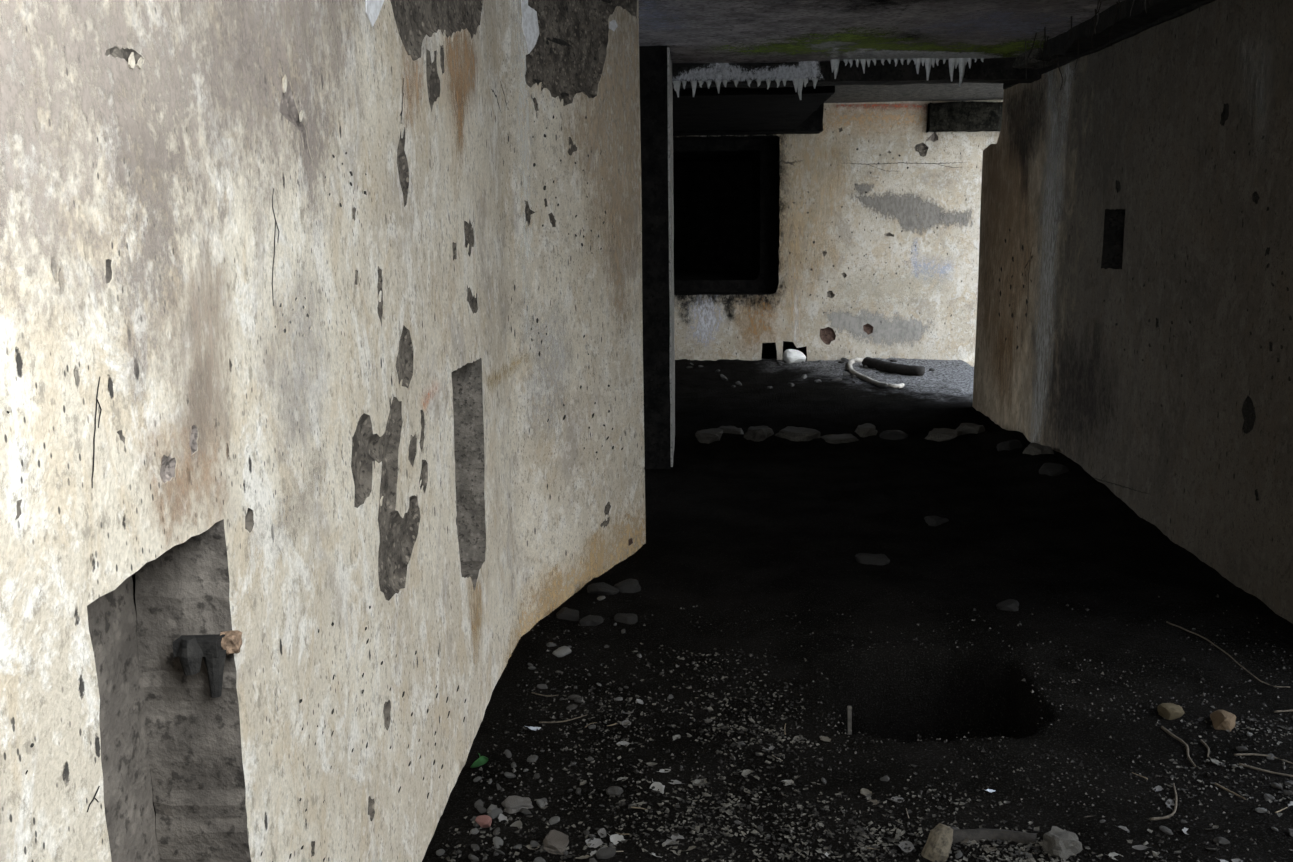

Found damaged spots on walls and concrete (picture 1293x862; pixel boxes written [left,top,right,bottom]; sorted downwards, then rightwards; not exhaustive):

peeling [365,0,483,111]
peeling [521,0,637,138]
damp [672,28,1043,82]
spalling [397,127,412,207]
spalling [377,266,386,327]
spalling [351,325,428,601]